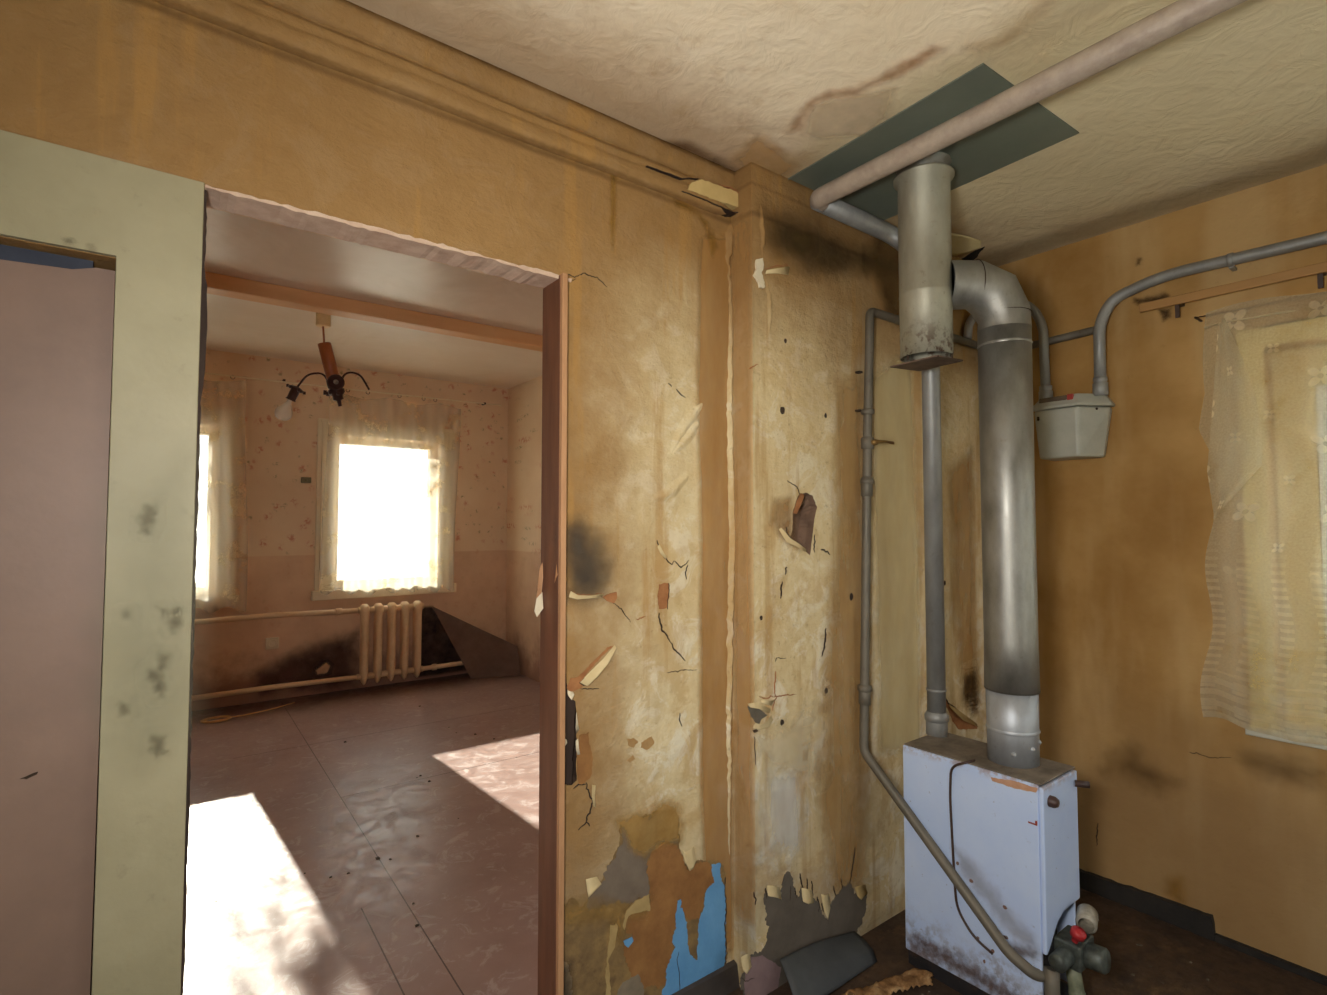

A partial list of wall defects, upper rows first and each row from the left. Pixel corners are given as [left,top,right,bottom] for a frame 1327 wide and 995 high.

damp [809,74,892,136]
spalling [774,480,830,555]
damp [258,641,354,693]
damp [418,607,466,677]
crack [570,541,693,673]
spalling [565,673,593,785]
peeling [564,804,867,995]